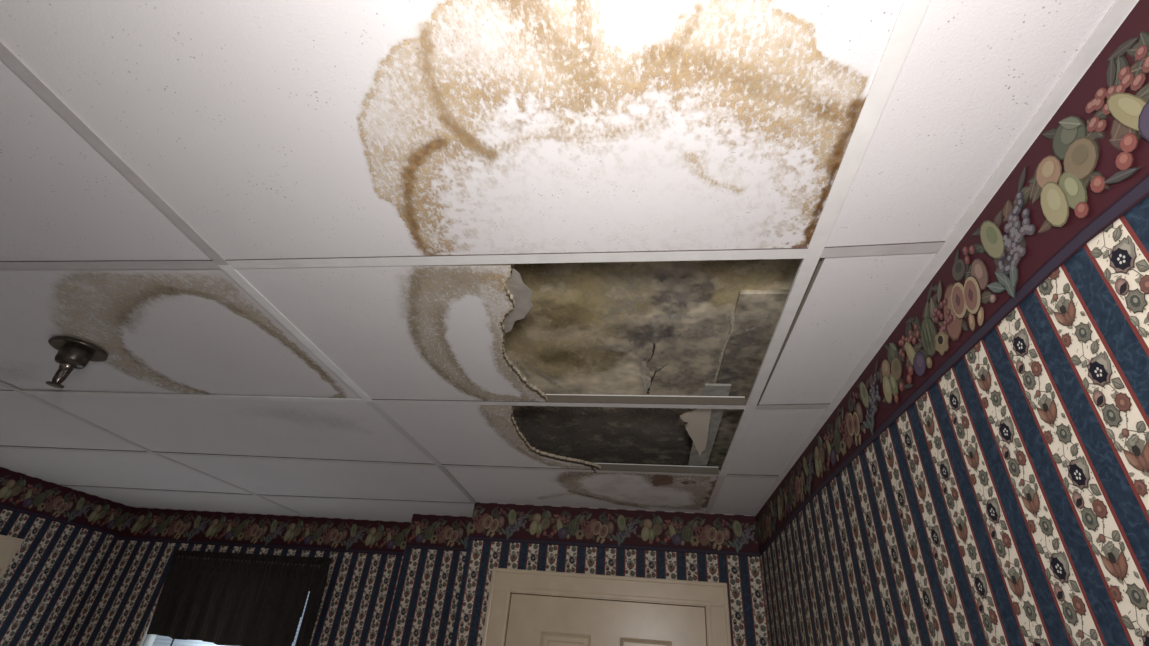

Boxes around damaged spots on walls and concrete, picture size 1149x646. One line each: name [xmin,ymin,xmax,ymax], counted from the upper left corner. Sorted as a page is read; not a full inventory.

damp [358,0,867,510]
damp [57,273,345,398]
spalling [680,409,712,456]